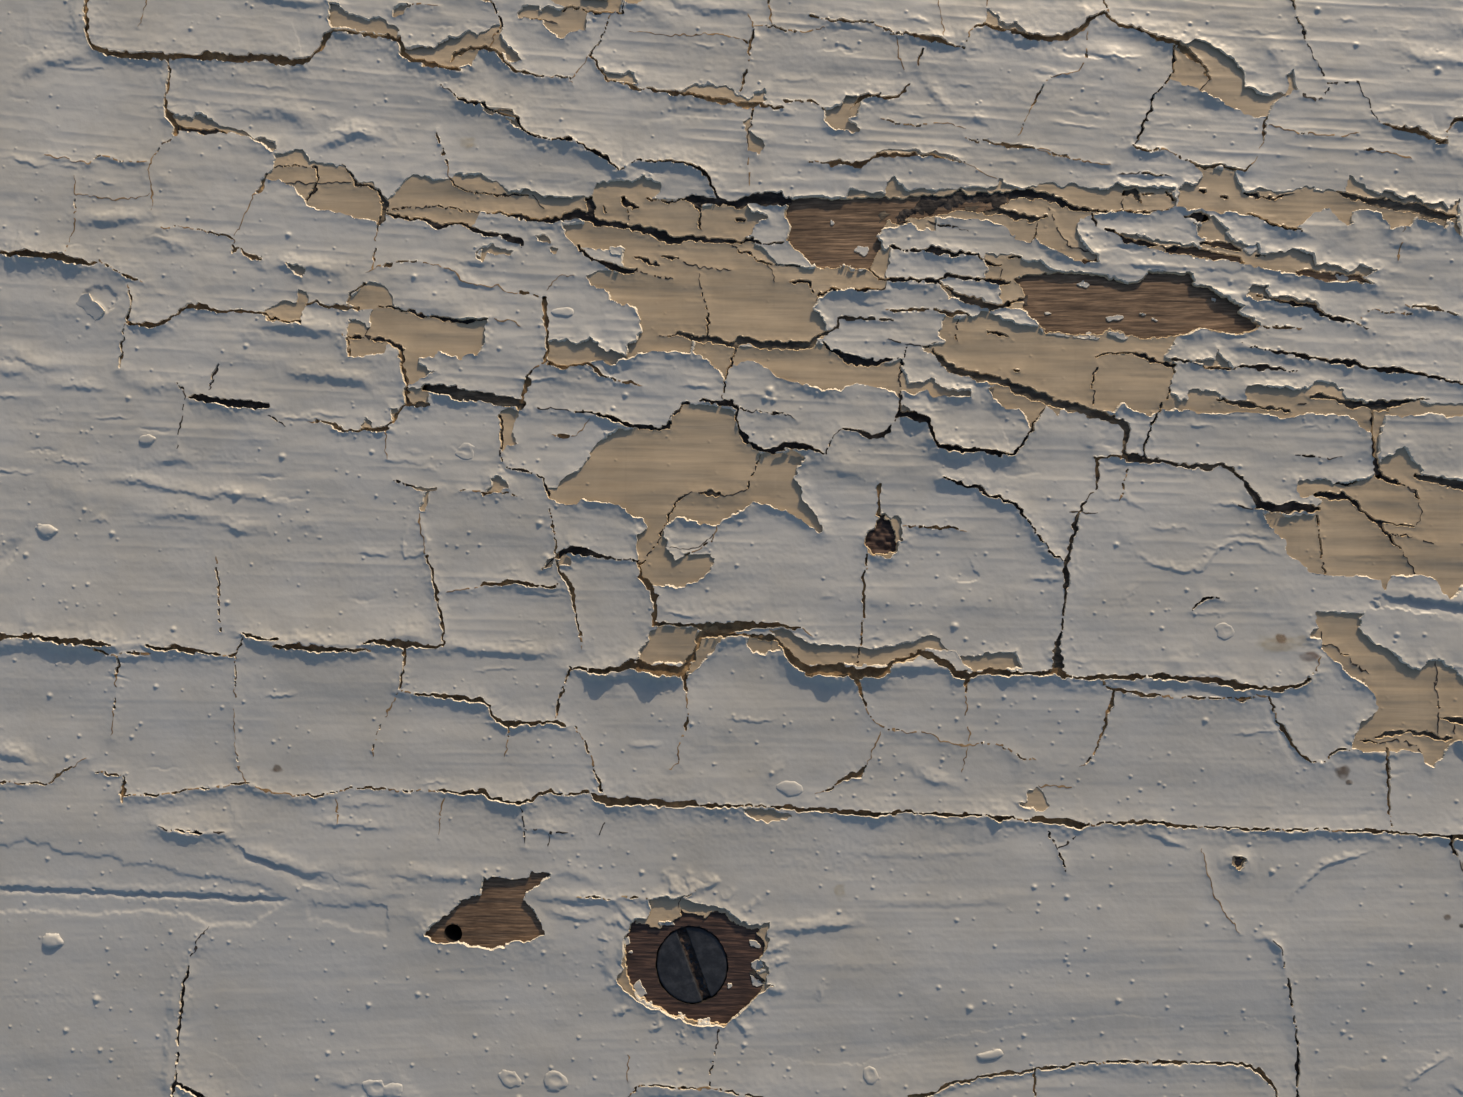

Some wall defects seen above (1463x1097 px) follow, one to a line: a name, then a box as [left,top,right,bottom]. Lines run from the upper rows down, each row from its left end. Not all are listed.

peeling [328,3,521,70]
peeling [1166,39,1297,122]
crack [0,0,1463,366]
peeling [173,114,1463,599]
crack [0,209,1463,933]
peeling [743,626,1024,674]
peeling [1310,611,1463,767]
crack [172,927,209,1097]
peeling [425,871,550,949]
peeling [617,895,771,1027]
crack [626,1029,763,1097]
crack [908,941,1300,1097]